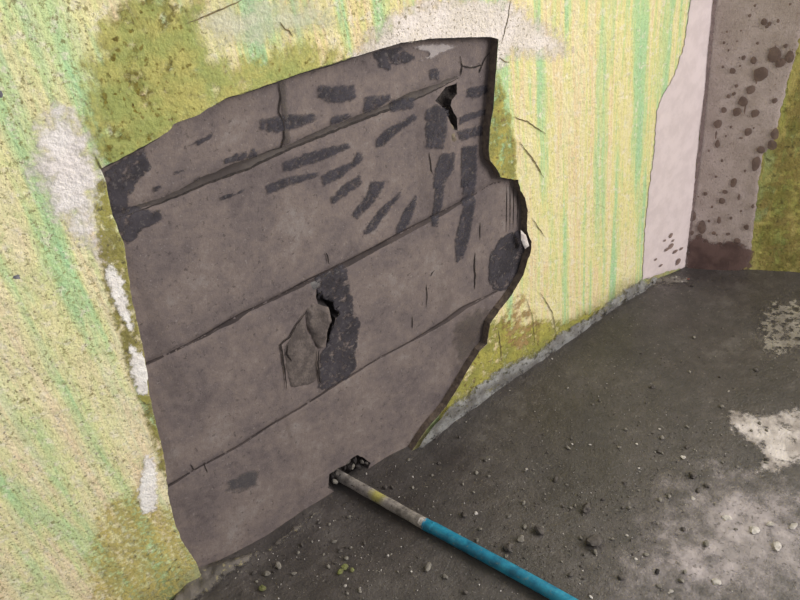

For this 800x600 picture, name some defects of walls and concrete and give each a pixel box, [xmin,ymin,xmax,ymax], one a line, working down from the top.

crack [263,87,285,154]
water stain [26,0,566,476]
flaking render [95,37,532,574]
water stain [417,80,800,450]
water stain [708,44,794,152]
water stain [730,410,800,473]